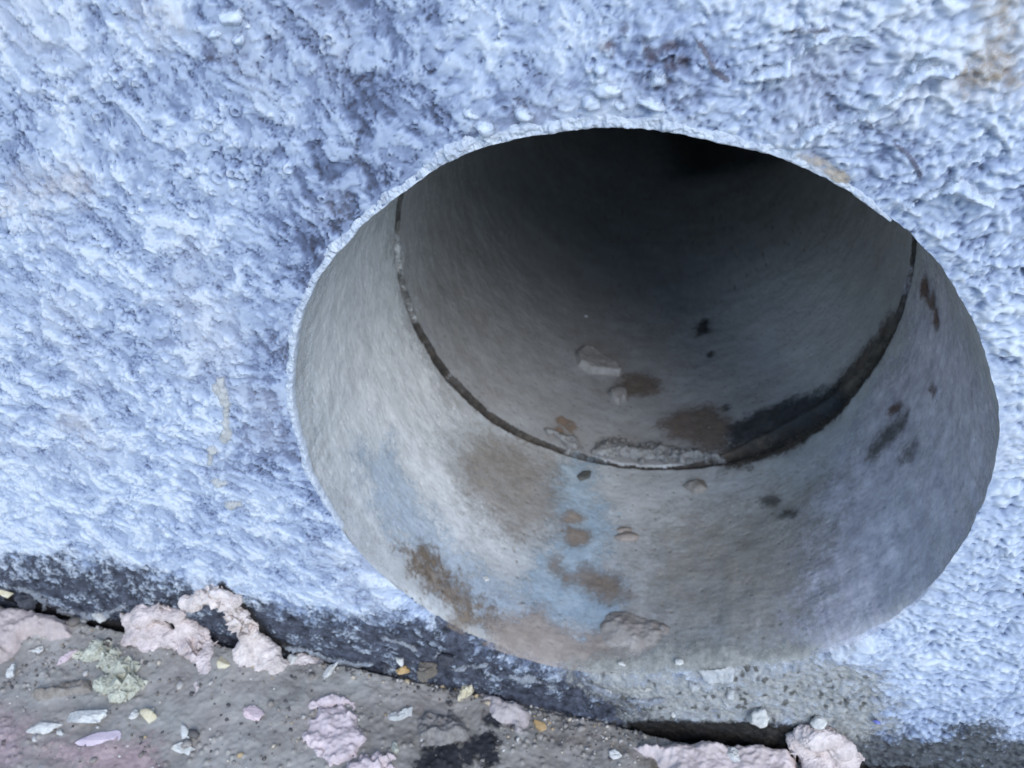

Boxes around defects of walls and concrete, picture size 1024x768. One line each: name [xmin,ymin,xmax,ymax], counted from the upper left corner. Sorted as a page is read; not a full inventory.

corrosion [617,372,661,397]
corrosion [657,406,731,450]
leakage [726,381,848,449]
leakage [781,262,997,652]
leakage [0,553,239,649]
corrosion [400,545,500,644]
leakage [245,598,659,730]